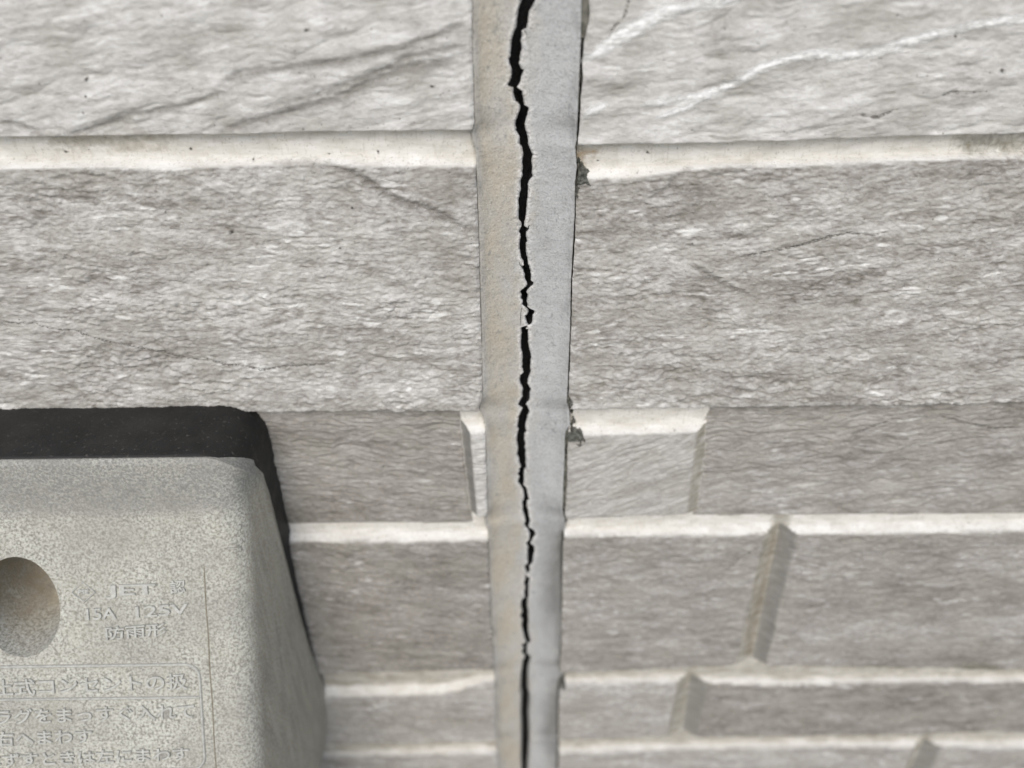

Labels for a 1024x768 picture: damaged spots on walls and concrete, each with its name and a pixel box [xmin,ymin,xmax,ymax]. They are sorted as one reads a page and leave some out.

crack [508,0,536,768]